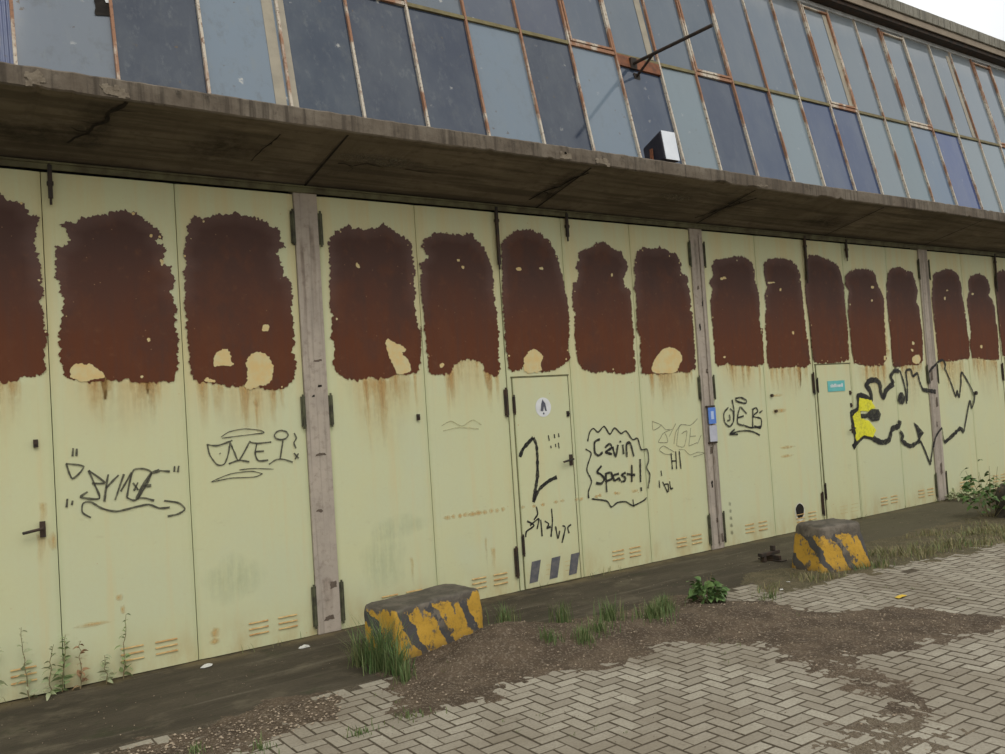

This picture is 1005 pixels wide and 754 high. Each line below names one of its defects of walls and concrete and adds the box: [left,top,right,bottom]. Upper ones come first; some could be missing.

crack [66,102,138,143]